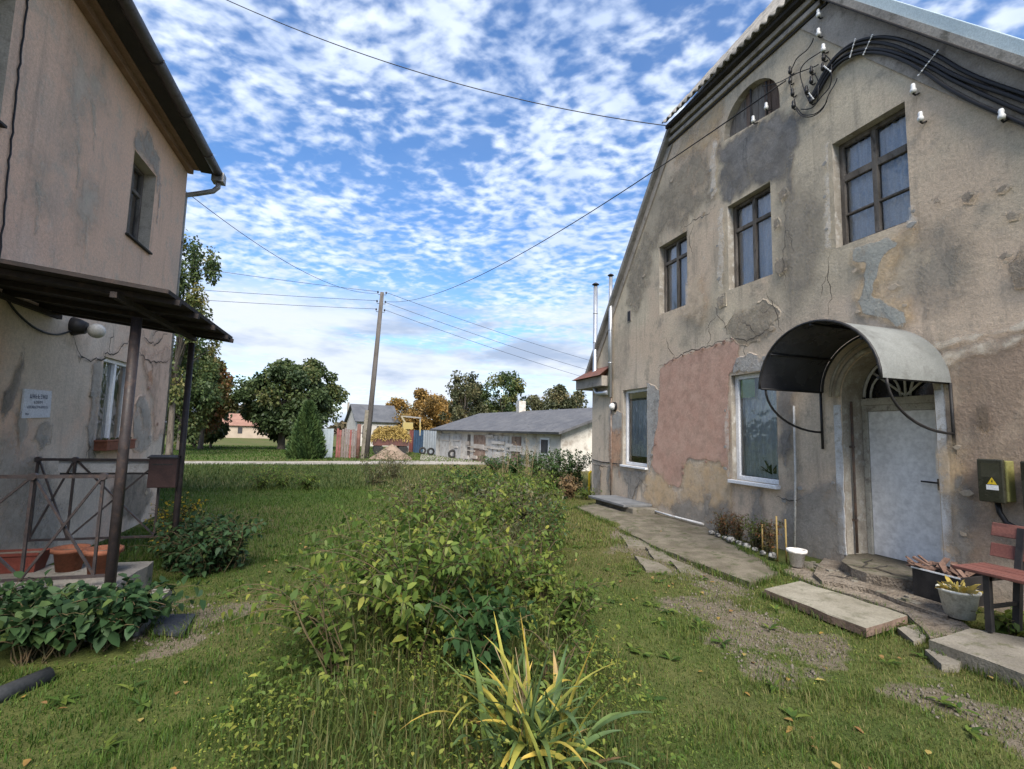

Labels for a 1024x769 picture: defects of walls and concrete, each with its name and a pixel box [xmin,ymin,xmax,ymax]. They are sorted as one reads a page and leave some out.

crack [658,201,793,368]
crack [821,254,832,314]
flaking render [851,209,917,324]
crack [73,328,166,366]
peeling [131,346,172,453]
peeling [643,208,782,508]